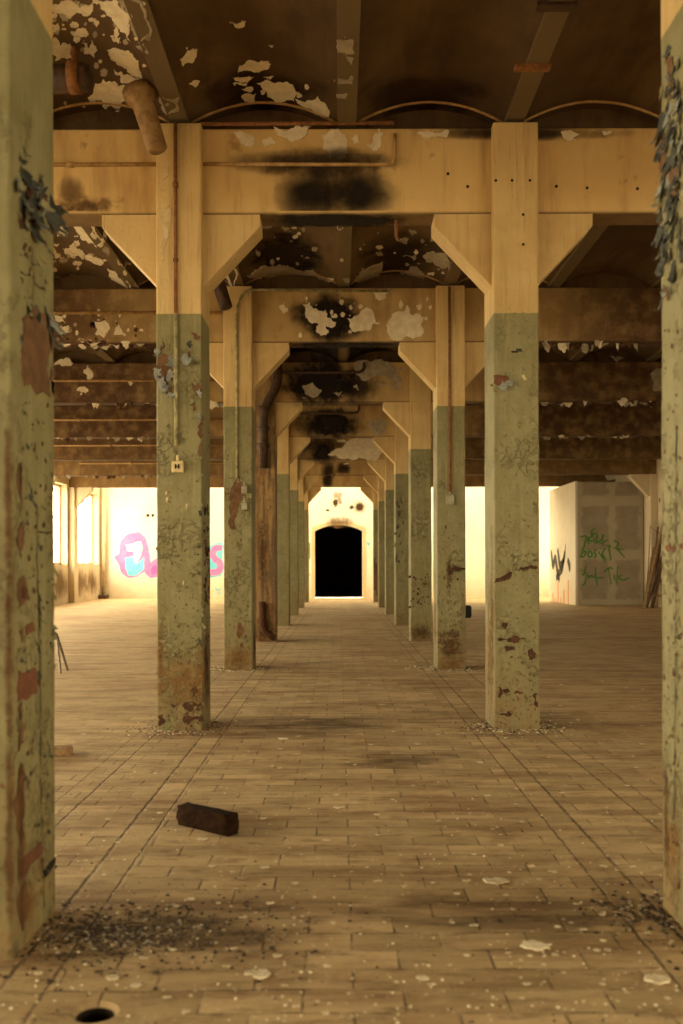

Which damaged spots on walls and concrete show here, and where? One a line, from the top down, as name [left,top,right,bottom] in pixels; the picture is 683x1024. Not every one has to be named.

damp [61,181,108,211]
peeling [53,0,152,112]
peeling [233,36,383,153]
peeling [418,130,449,139]
peeling [561,130,579,141]
peeling [647,44,683,311]
peeling [226,229,453,341]
peeling [491,366,527,393]
spalling [542,339,644,363]
peeling [12,146,224,931]
spalling [494,550,538,603]
spalling [495,617,538,717]